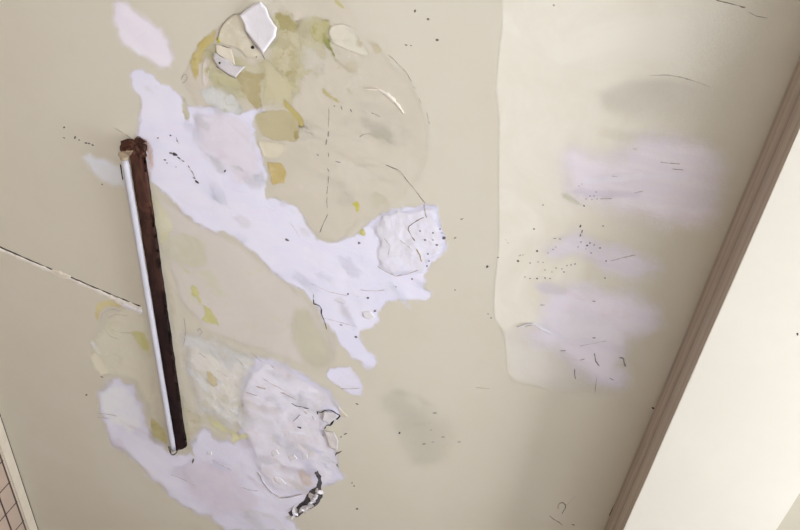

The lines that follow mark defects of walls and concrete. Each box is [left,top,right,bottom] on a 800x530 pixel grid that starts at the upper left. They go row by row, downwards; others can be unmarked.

peeling [184,0,431,242]
crack [0,246,142,340]
rust [118,136,187,455]
spalling [288,471,324,520]